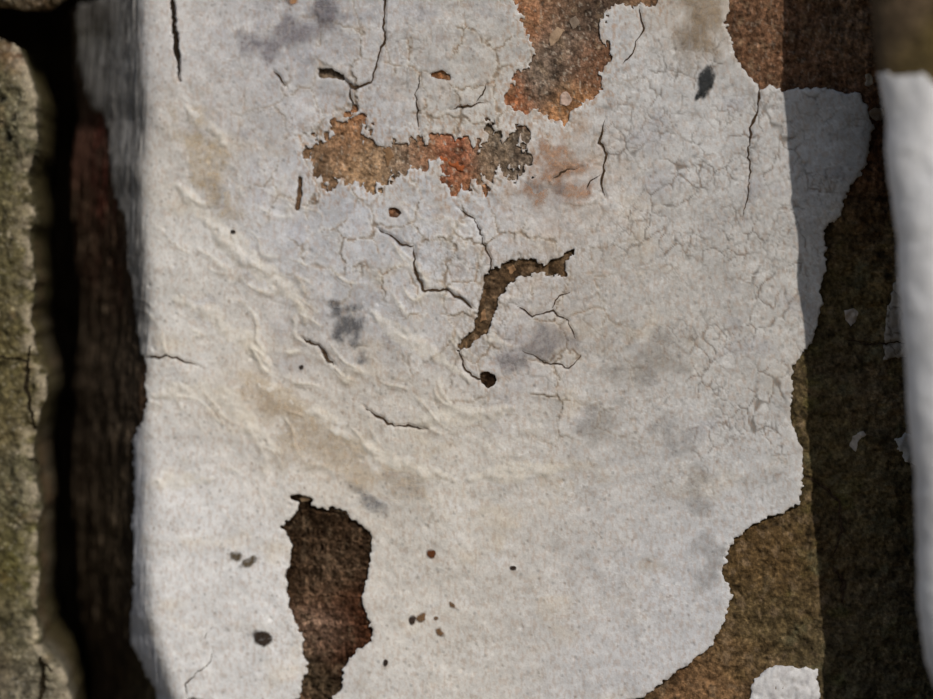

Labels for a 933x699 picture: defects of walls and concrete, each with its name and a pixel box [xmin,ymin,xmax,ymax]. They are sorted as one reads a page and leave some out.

crack [170,0,180,81]
crack [345,0,386,106]
peeling [302,0,658,197]
peeling [295,176,303,210]
crack [554,121,608,195]
crack [743,89,761,214]
crack [379,229,472,308]
spalling [480,372,497,388]
spalling [457,249,575,352]
crack [517,292,581,368]
peeling [636,0,933,699]
peeling [280,494,373,699]